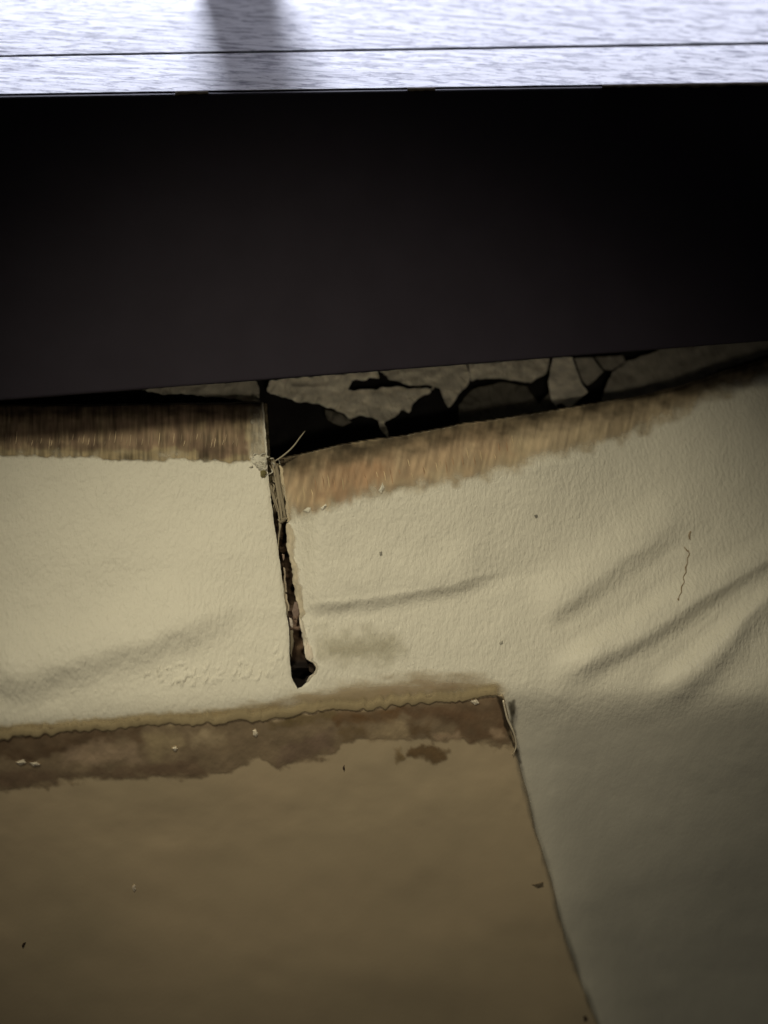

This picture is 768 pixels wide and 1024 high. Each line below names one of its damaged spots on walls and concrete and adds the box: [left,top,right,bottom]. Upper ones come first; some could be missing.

flaking render [0,341,768,463]
crack [250,404,317,688]
damp [295,679,498,703]